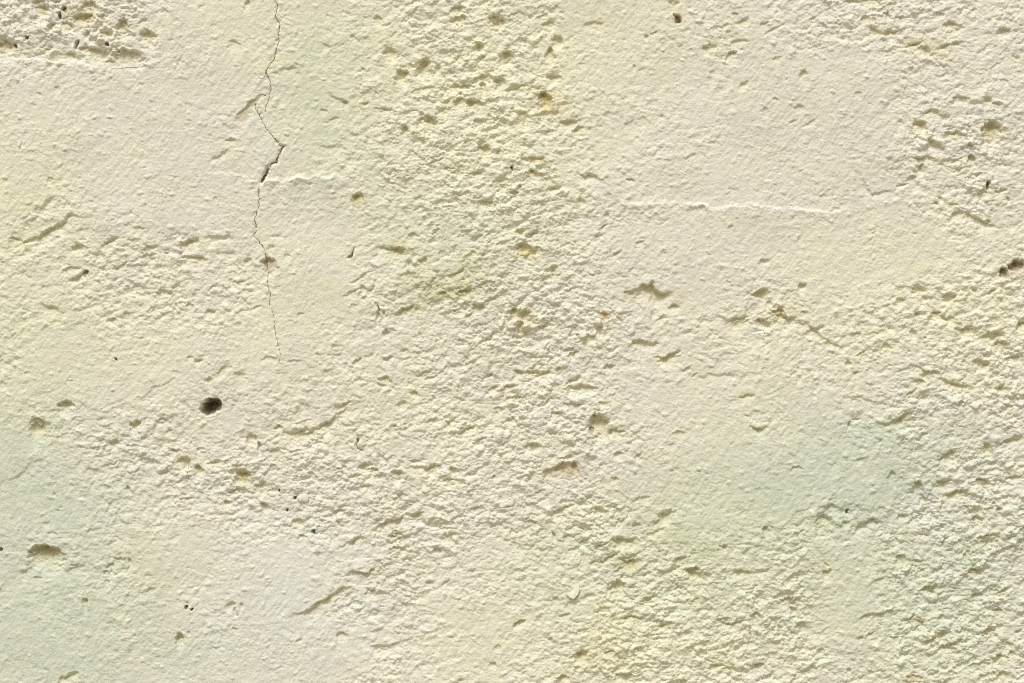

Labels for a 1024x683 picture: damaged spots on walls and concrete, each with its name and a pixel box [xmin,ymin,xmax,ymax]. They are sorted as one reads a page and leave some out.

crack [254,2,284,362]